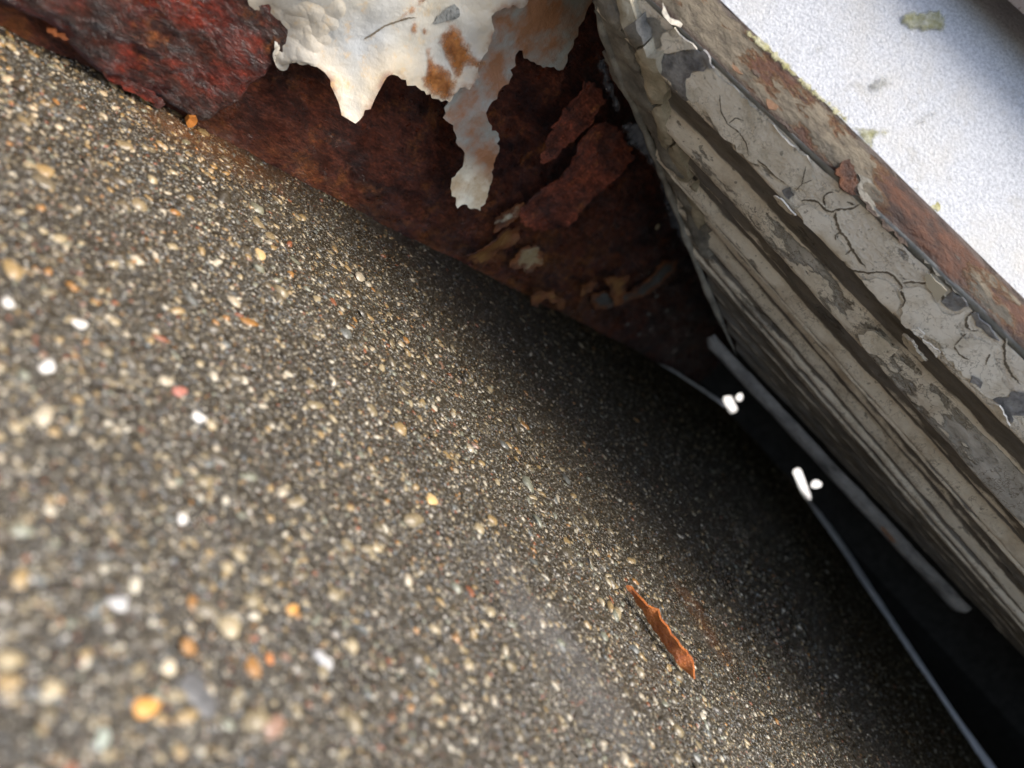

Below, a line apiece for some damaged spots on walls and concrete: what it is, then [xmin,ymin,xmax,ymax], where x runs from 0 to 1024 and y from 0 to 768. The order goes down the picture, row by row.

rust [46,28,69,40]
rust [426,31,479,98]
peeling [248,0,592,210]
peeling [646,2,851,262]
rust [467,81,636,275]
crack [719,95,946,309]
rust [834,159,858,196]
rust [530,290,565,310]
rust [579,275,630,307]
spalling [589,258,678,310]
peeling [857,174,1024,423]
crack [954,311,1023,385]